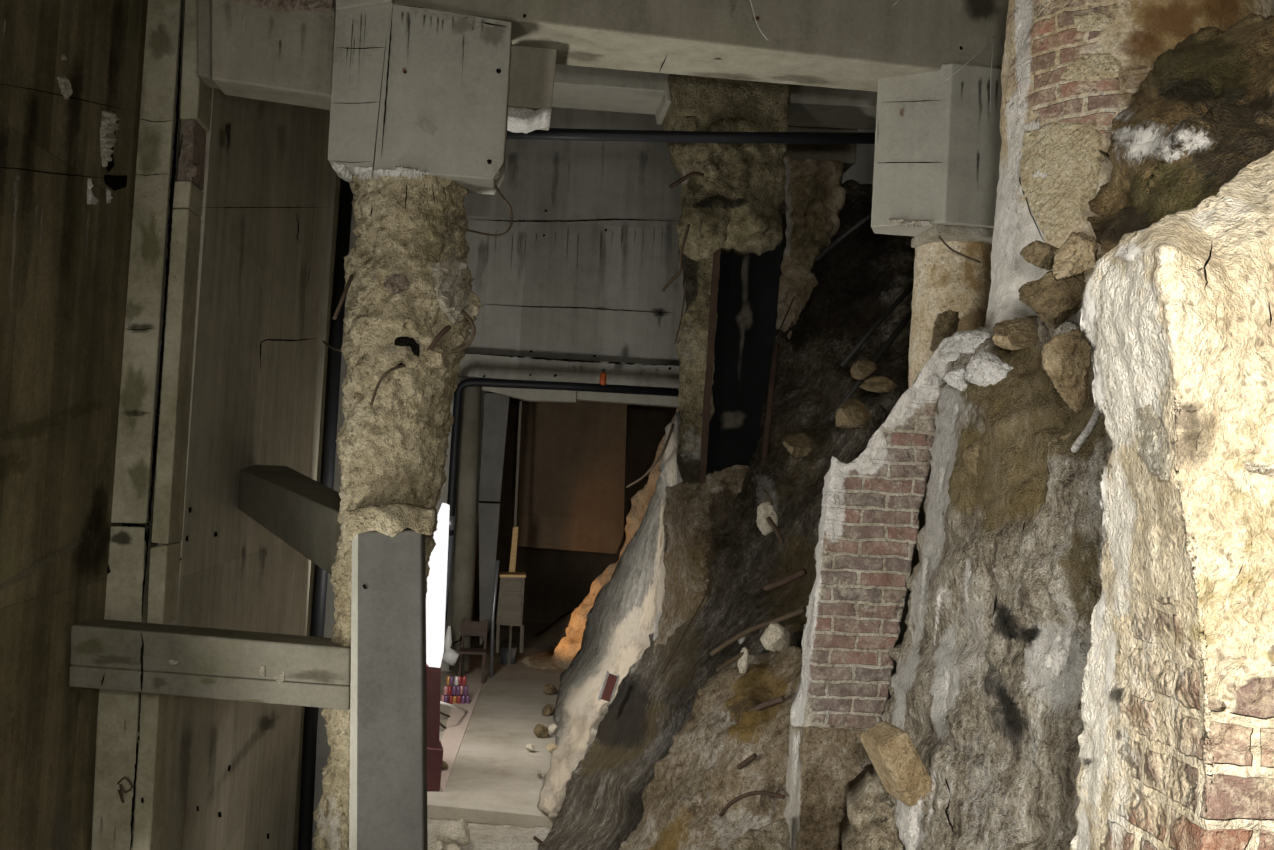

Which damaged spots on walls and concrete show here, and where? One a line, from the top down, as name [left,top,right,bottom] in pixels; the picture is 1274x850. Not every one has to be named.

spalling [331,163,429,180]
spalling [373,274,409,292]
spalling [394,337,420,366]